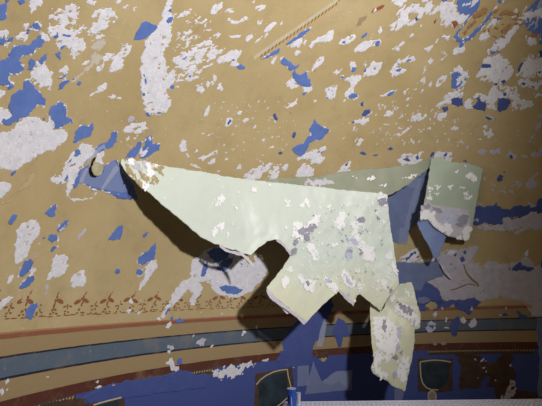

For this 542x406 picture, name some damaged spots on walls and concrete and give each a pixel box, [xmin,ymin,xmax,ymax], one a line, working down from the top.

peeling [0,0,137,176]
peeling [96,0,249,117]
peeling [333,0,542,150]
peeling [50,116,542,405]